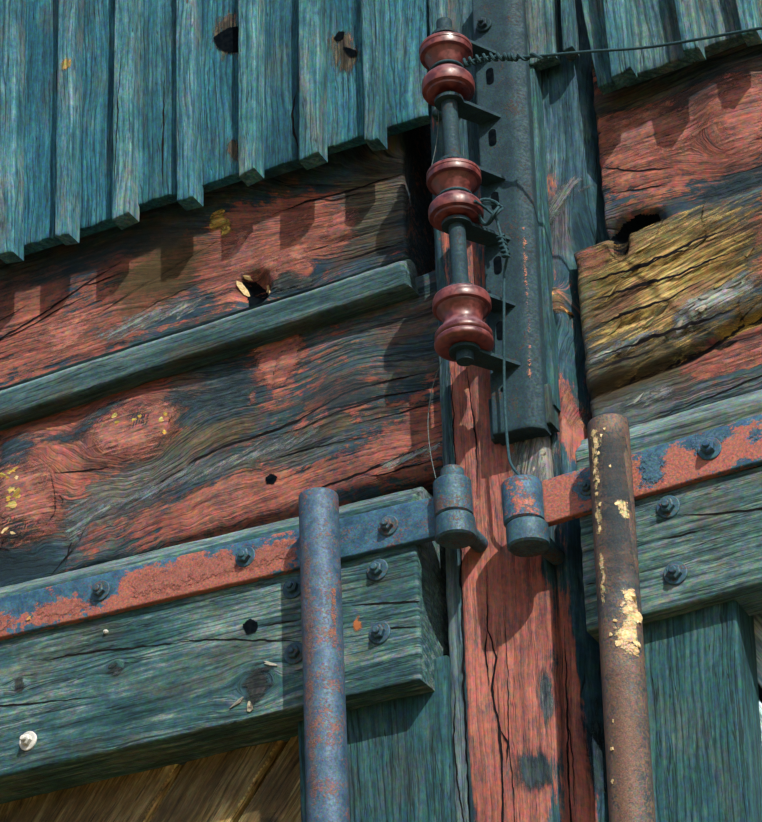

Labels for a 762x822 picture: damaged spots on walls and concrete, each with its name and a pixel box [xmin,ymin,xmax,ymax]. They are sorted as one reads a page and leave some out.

crack [584,205,762,401]
peeling [161,334,304,423]
peeling [0,399,151,471]
crack [37,619,301,663]
corrosion [328,588,336,647]
peeling [609,588,643,656]
crack [453,548,515,822]